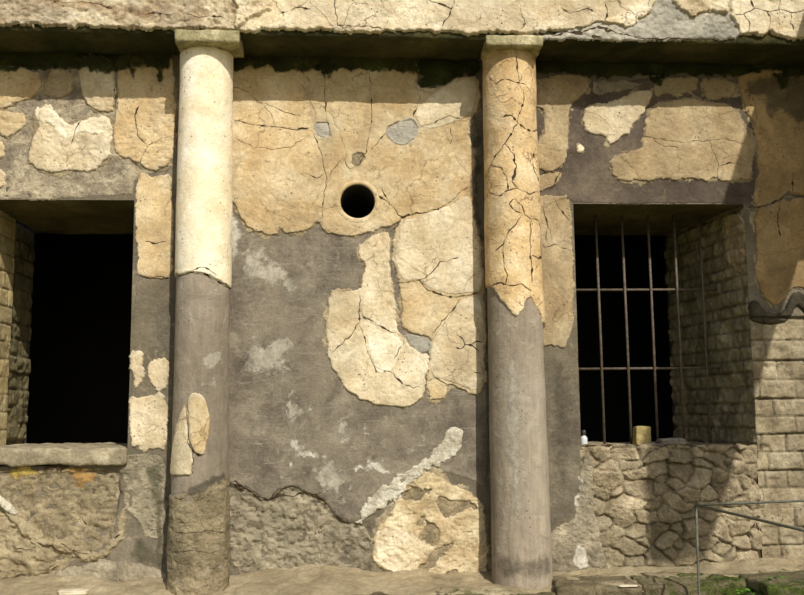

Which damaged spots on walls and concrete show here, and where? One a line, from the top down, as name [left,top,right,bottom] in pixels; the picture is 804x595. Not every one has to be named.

crack [334,0,382,30]
crack [553,4,699,42]
crack [736,0,803,32]
crack [234,75,386,217]
crack [379,187,468,231]
crack [400,56,569,332]
flaking render [232,49,804,404]
spalling [0,46,492,595]
crack [334,299,449,388]
crack [456,335,482,351]
crack [230,480,324,501]
spalling [551,452,606,572]